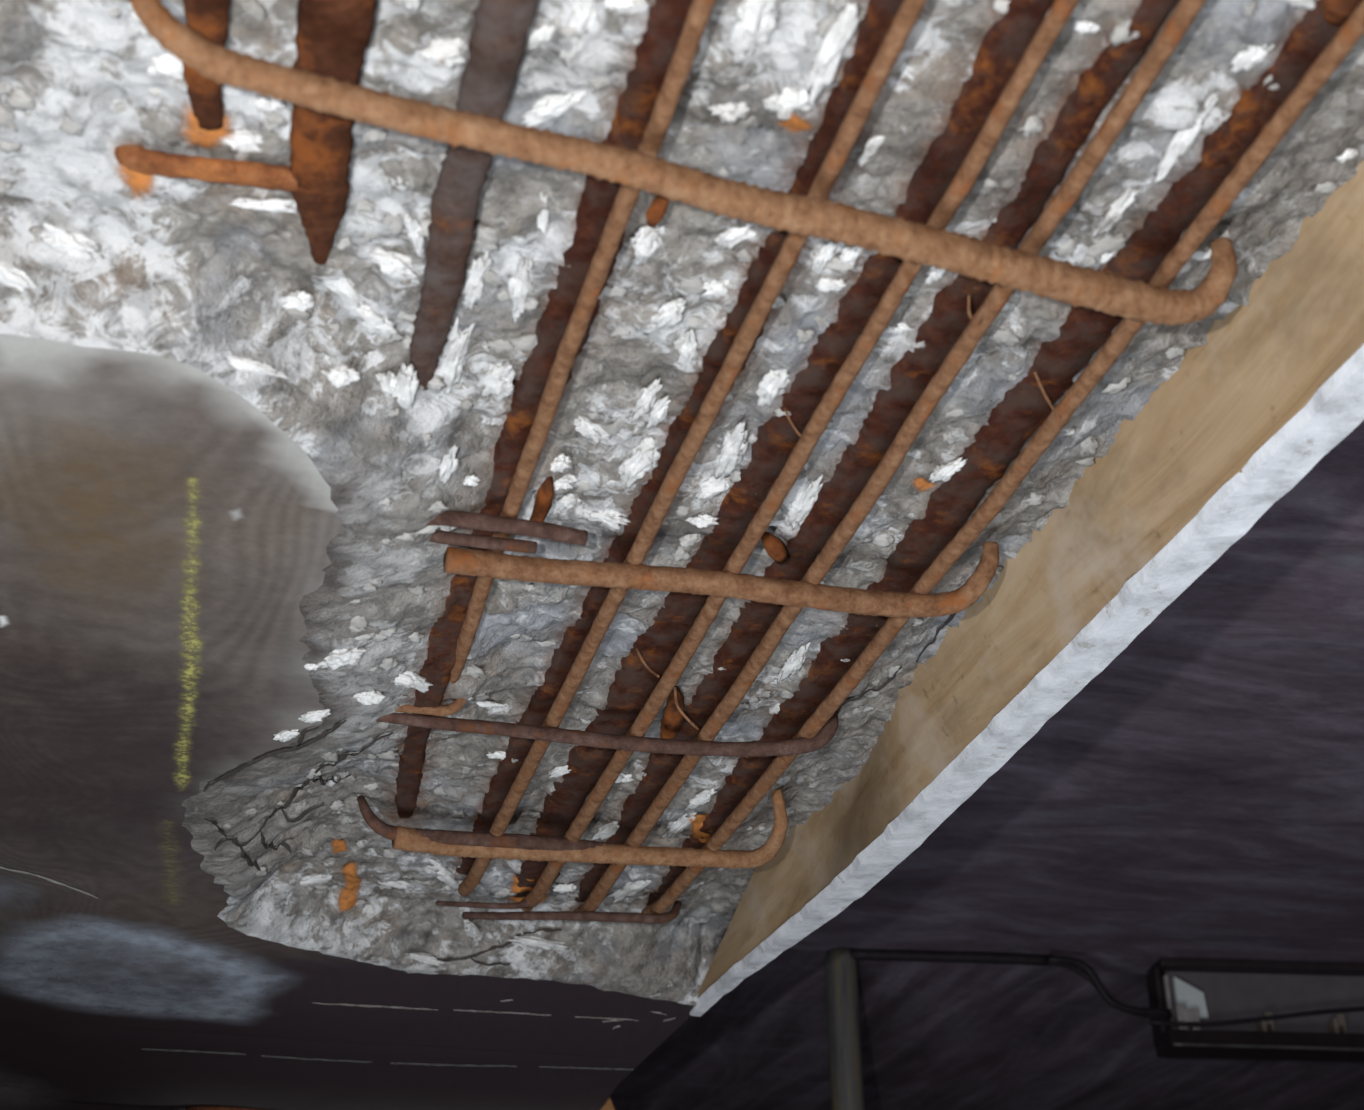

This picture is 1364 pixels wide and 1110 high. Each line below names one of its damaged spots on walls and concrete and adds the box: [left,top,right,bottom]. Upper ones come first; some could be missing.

spalling [656,0,869,193]
rust [896,0,1055,225]
rust [1102,0,1345,283]
spalling [0,0,775,1006]
rust [480,174,621,516]
spalling [642,235,879,568]
rust [686,253,903,571]
rust [764,274,995,581]
rust [866,305,1123,593]
spalling [720,0,1364,851]
crack [204,720,393,871]
spalling [641,607,849,848]